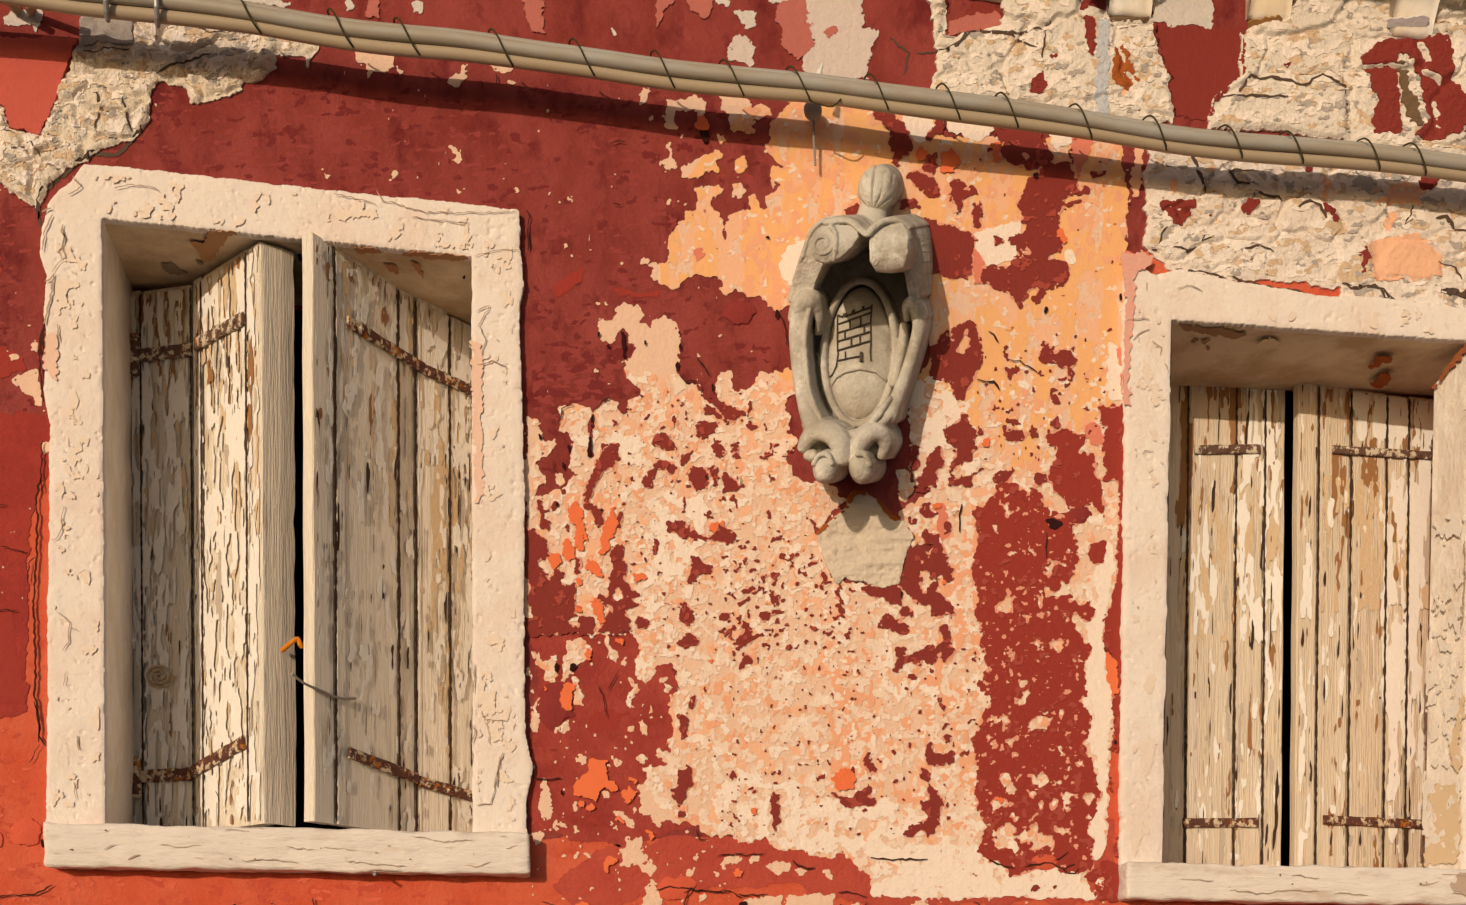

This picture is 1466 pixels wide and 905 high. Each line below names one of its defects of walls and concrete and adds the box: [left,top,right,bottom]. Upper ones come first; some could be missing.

flaking render [0,16,319,208]
flaking render [926,0,1174,125]
crack [1191,156,1327,218]
crack [1221,73,1347,98]
flaking render [1207,0,1466,155]
peeling [504,88,1466,905]
crack [0,441,79,797]